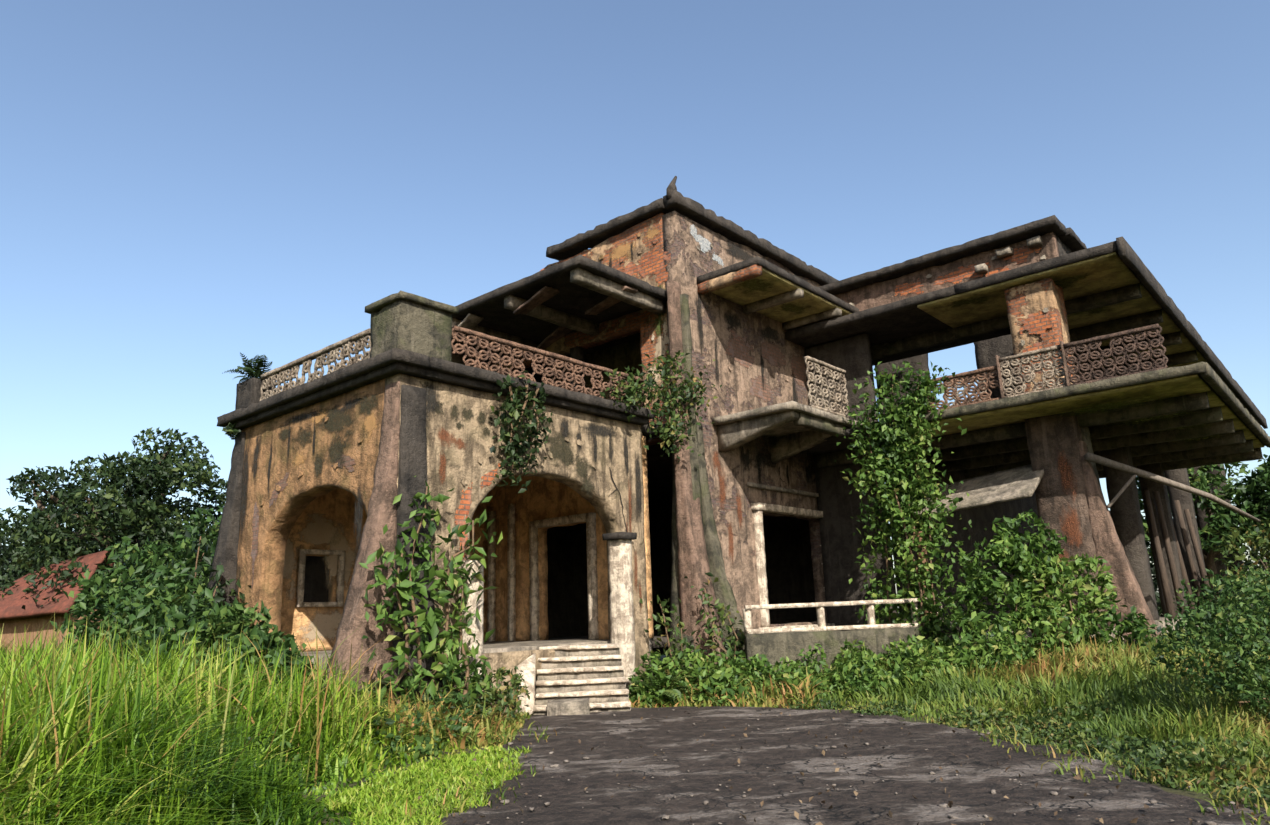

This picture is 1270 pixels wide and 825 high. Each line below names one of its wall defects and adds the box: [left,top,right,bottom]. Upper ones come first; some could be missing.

flaking render [594,227,671,286]
flaking render [891,246,1046,299]
flaking render [1019,308,1054,367]
damp [425,382,498,436]
damp [234,395,378,599]
damp [561,418,641,535]